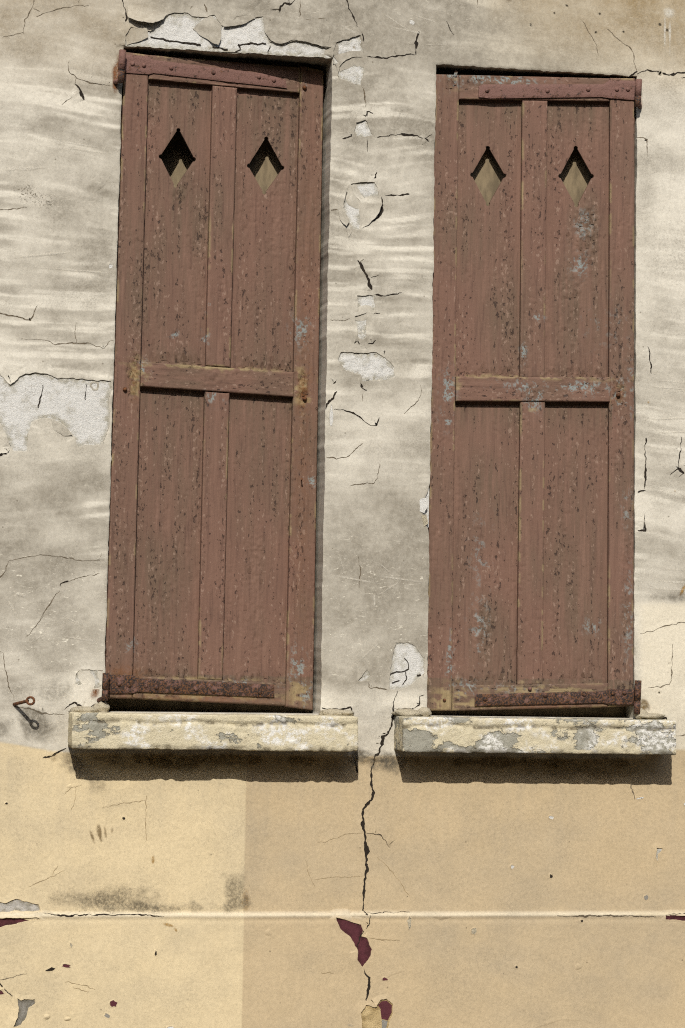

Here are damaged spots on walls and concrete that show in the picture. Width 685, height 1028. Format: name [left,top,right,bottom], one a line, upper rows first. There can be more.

peeling [116,0,372,92]
crack [584,23,685,78]
peeling [332,290,400,387]
peeling [0,363,111,462]
crack [0,551,102,636]
crack [0,651,103,715]
peeling [355,638,427,693]
crack [317,683,424,941]
peeling [0,891,48,933]
peeling [328,908,377,975]
crack [361,968,371,1001]
peeling [352,976,397,1028]